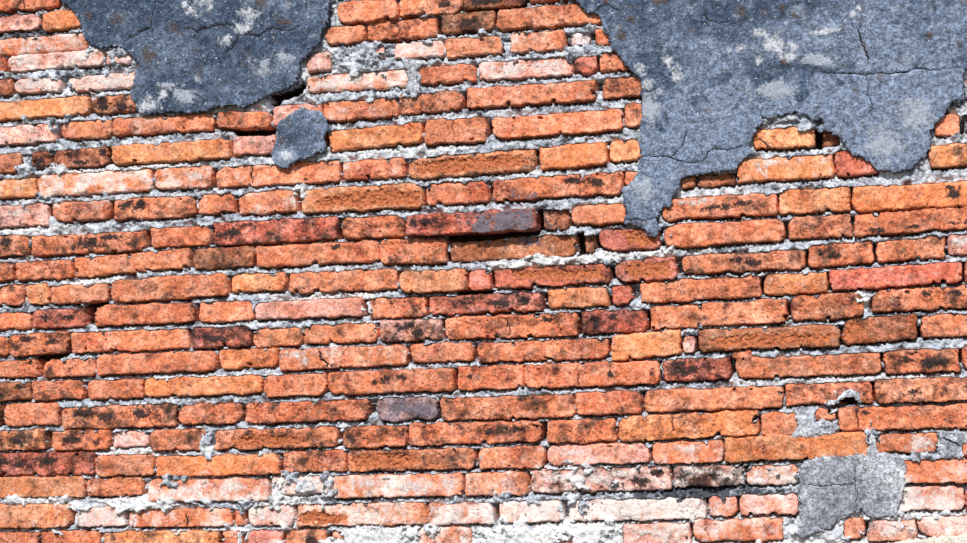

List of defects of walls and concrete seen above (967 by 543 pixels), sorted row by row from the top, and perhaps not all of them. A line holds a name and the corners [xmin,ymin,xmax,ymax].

crack [823,24,955,120]
crack [645,129,768,163]
spalling [415,153,529,175]
spalling [314,187,421,208]
spalling [617,230,657,248]
spalling [512,267,605,283]
spalling [621,261,672,280]
spalling [709,320,864,349]
spalling [230,432,304,449]
spalling [351,452,421,470]
spalling [297,509,348,525]